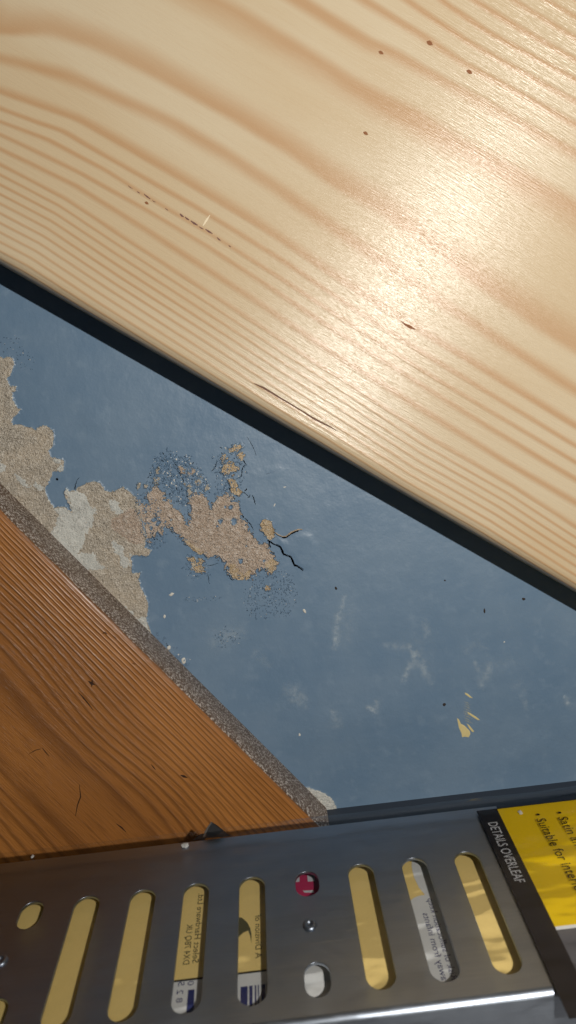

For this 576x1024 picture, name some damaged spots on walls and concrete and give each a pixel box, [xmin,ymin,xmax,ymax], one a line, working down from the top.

peeling [0,337,306,666]
crack [212,439,304,570]